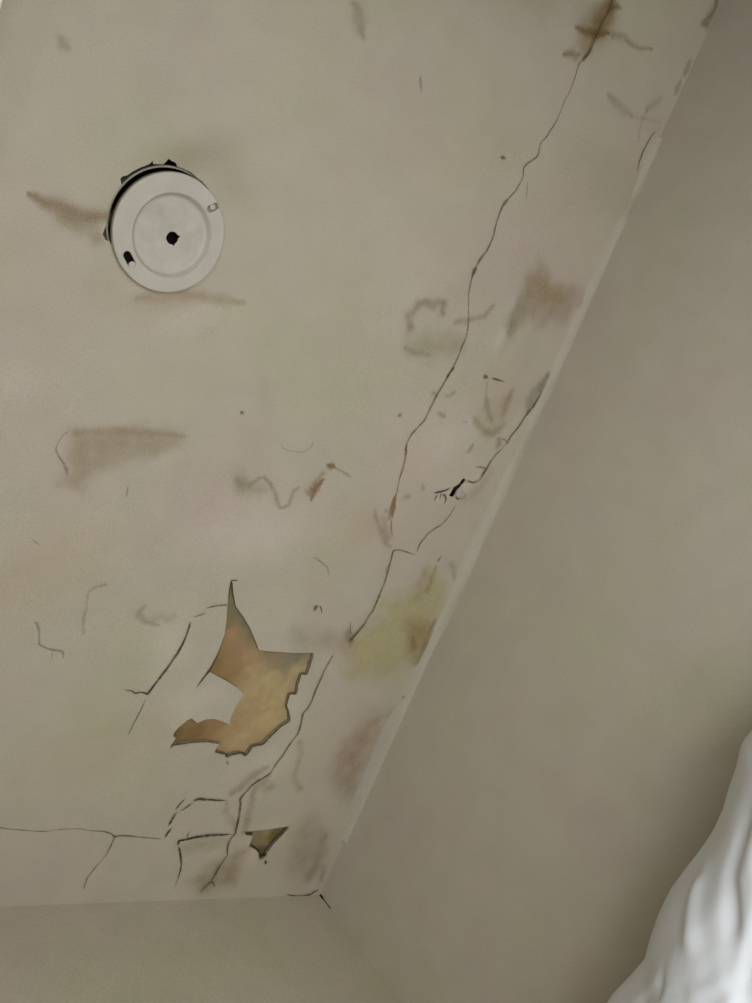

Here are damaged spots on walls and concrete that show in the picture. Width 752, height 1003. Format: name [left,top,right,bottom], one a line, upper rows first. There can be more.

crack [469,0,613,291]
crack [397,320,469,490]
crack [469,395,540,483]
crack [350,509,454,640]
crack [128,605,217,735]
peeling [170,580,313,757]
crack [5,659,331,887]
peeling [245,826,289,864]